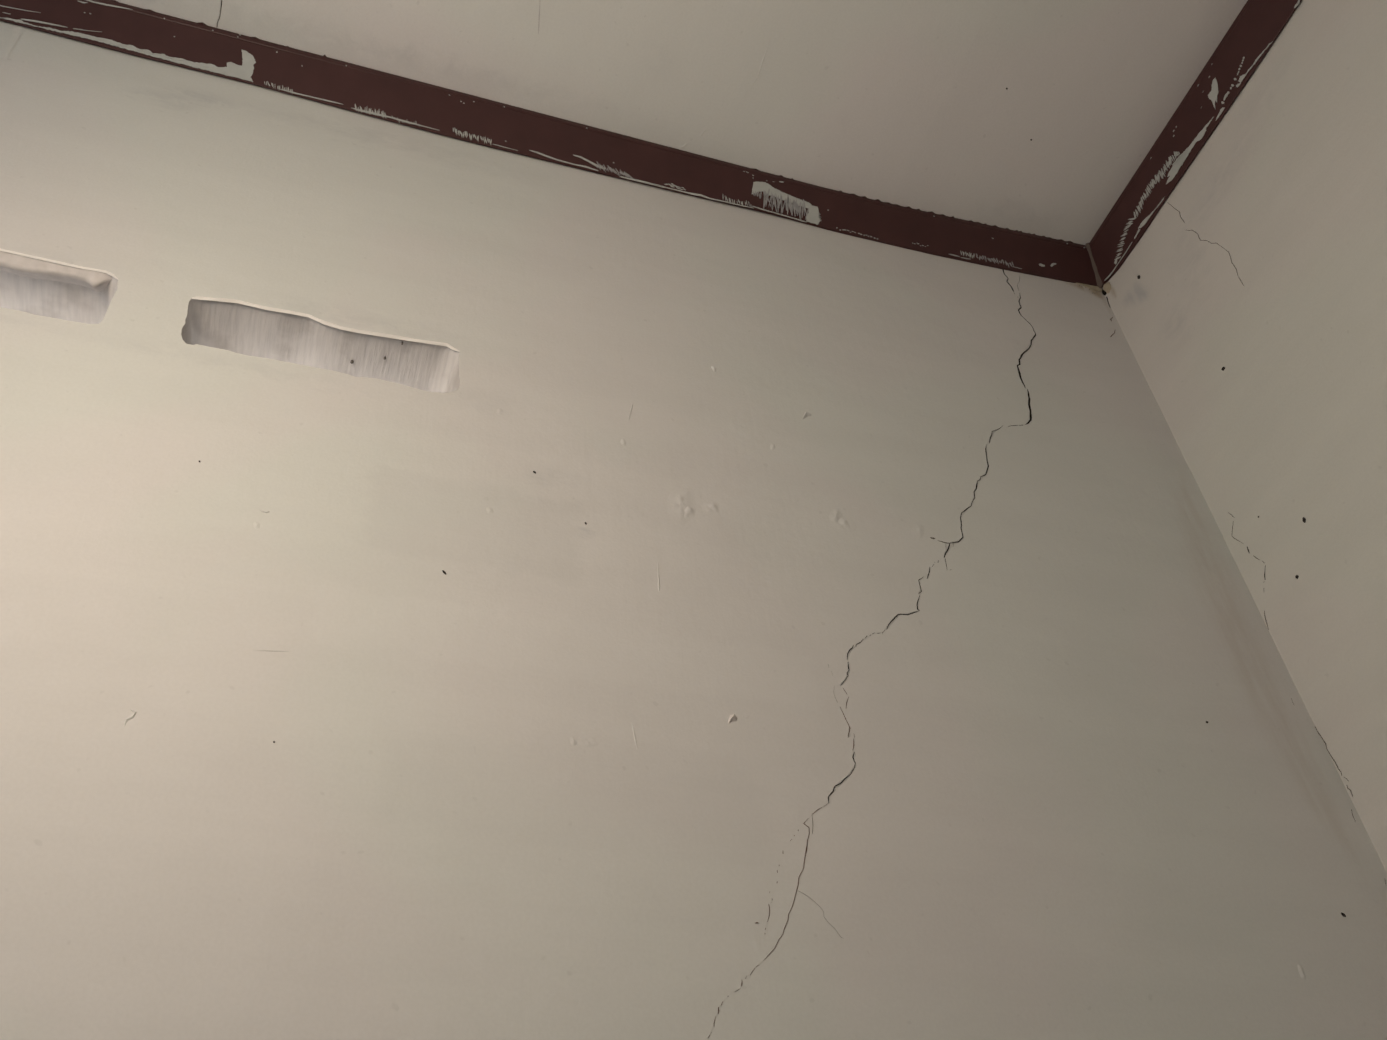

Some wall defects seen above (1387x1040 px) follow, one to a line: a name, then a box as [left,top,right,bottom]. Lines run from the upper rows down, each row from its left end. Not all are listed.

crack [1167,202,1244,286]
crack [708,269,1036,1038]